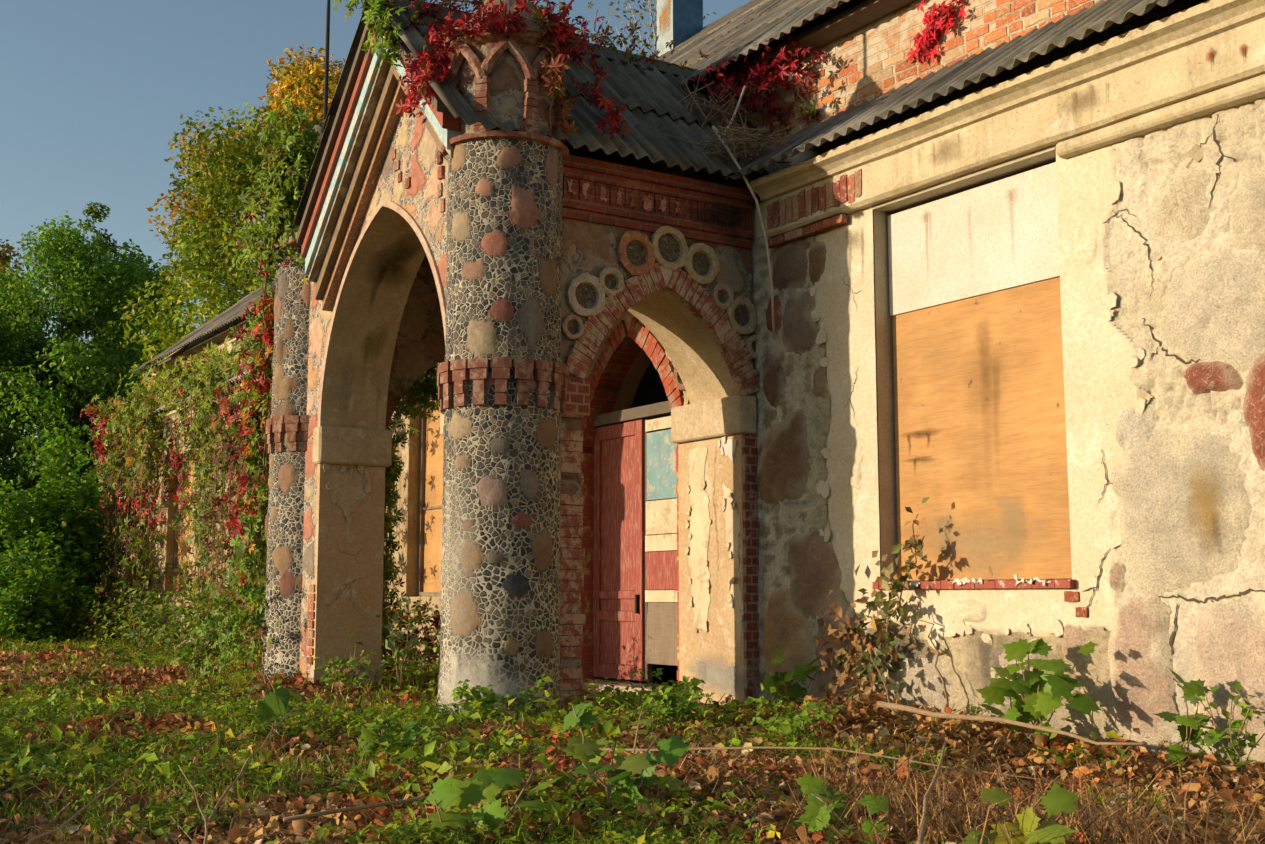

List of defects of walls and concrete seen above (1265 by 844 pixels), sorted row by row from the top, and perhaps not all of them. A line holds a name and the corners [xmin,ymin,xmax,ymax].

crack [1187,114,1236,207]
crack [1103,209,1200,364]
flaking render [684,97,1265,765]
crack [1082,547,1111,608]